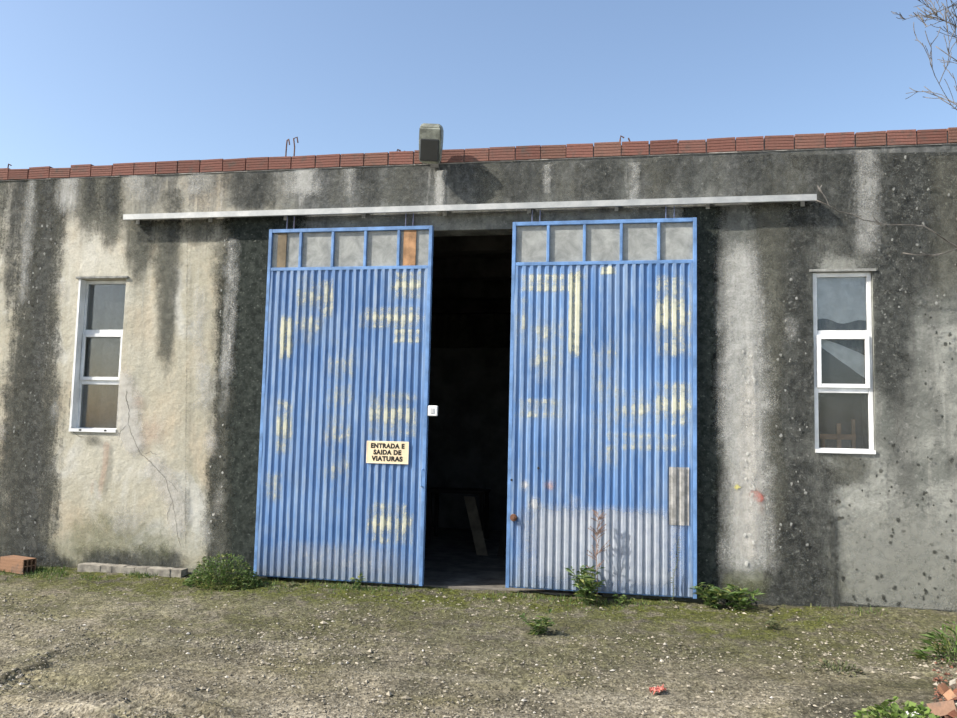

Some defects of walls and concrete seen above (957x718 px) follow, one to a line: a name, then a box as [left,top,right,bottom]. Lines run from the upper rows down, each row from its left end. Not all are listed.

damp [289,169,320,195]
peeling [280,284,333,357]
peeling [368,308,420,343]
peeling [529,272,582,355]
peeling [656,278,690,354]
damp [0,173,306,580]
peeling [276,402,291,448]
peeling [369,397,415,434]
peeling [656,384,691,424]
damp [436,152,957,611]
crack [119,393,186,545]
peeling [368,504,411,543]